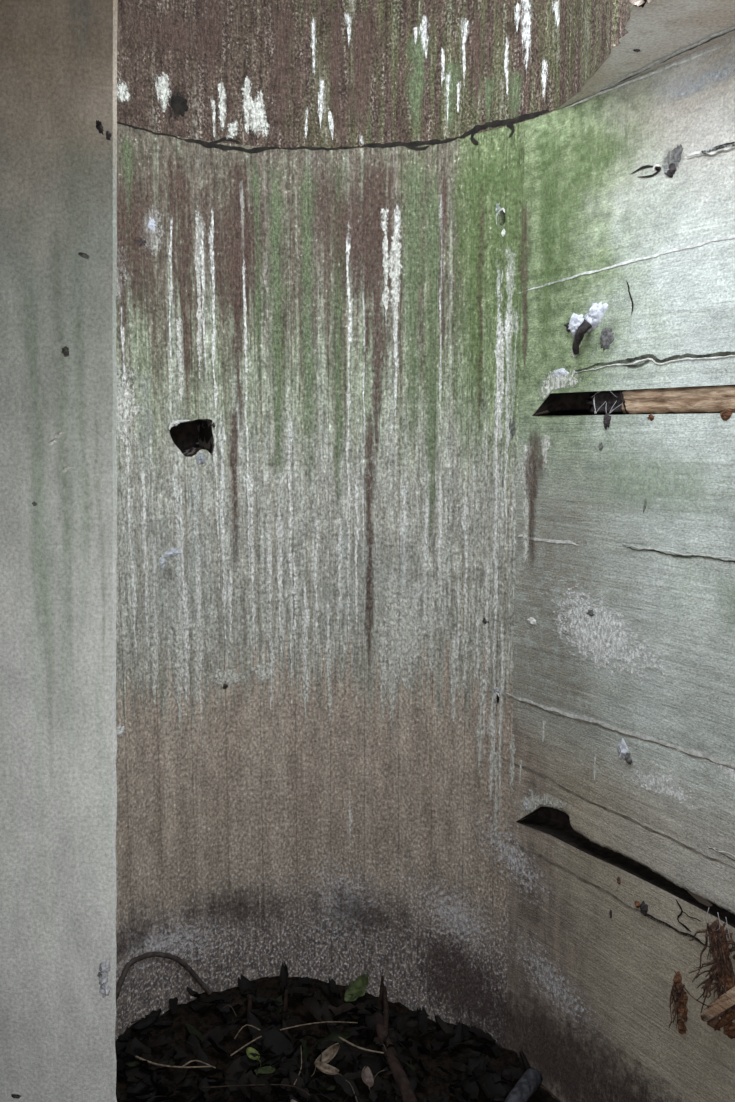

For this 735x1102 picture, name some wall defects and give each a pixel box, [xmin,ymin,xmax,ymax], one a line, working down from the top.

water stain [155,73,170,112]
water stain [211,4,295,138]
spalling [117,0,653,148]
water stain [441,0,531,128]
crack [117,110,549,153]
crack [575,351,735,373]
spalling [169,419,216,465]
water stain [116,139,447,738]
water stain [450,189,558,913]
crack [622,543,735,563]
crack [709,847,735,861]
crack [646,900,708,947]